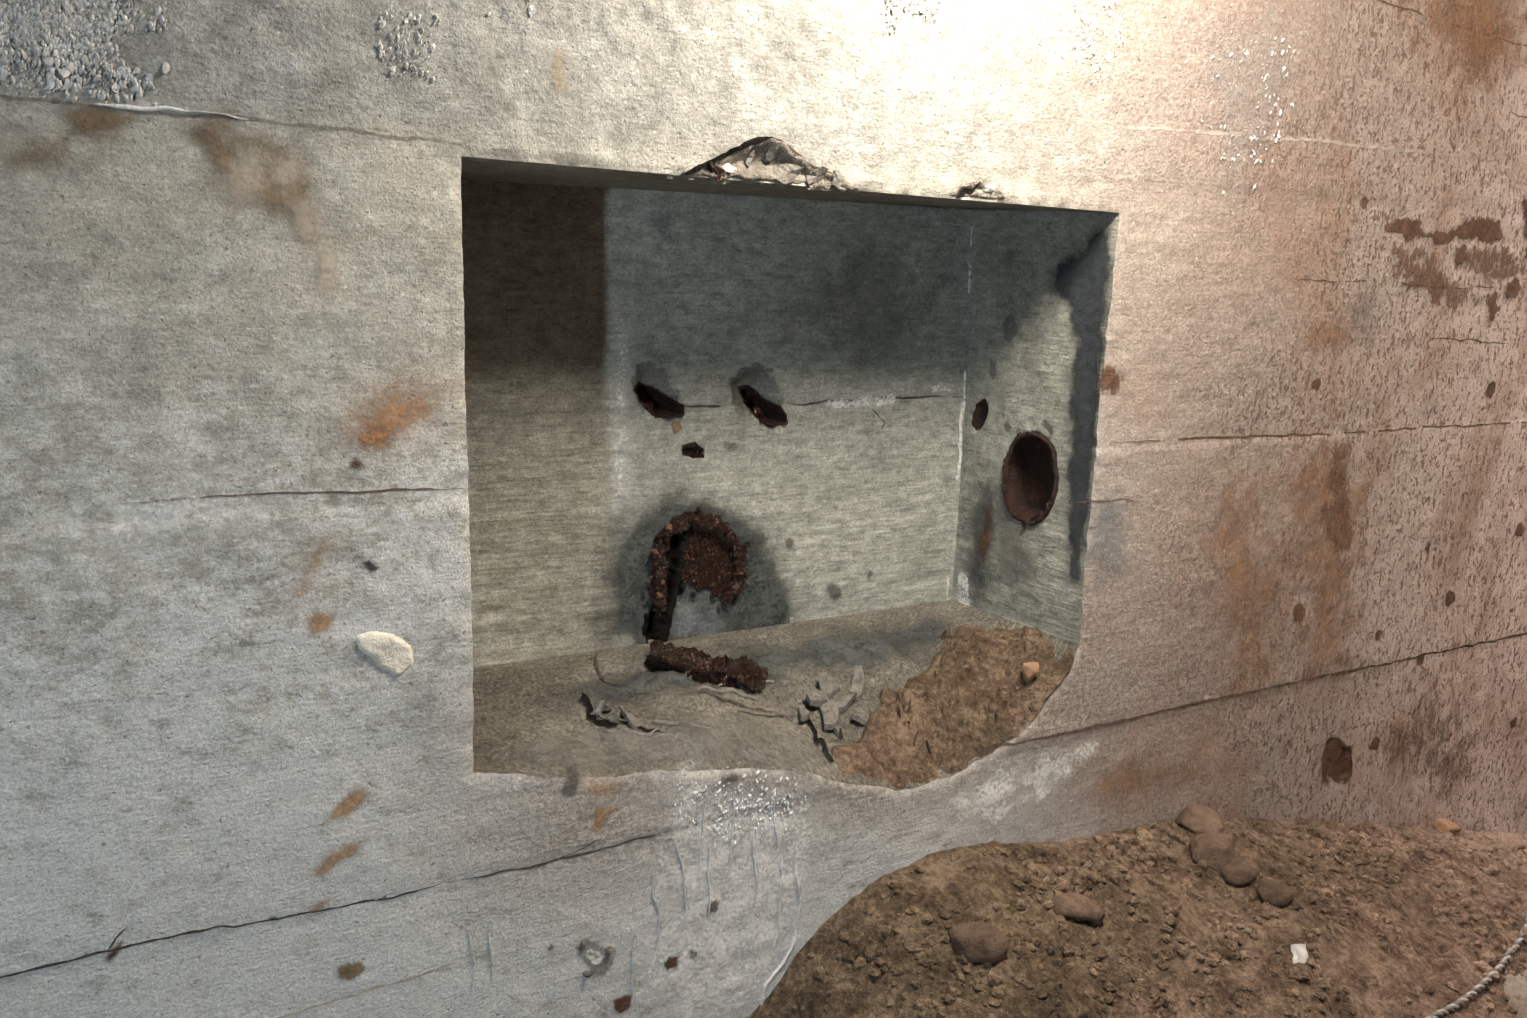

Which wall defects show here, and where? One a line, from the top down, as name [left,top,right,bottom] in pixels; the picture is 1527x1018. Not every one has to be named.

spalling [667,136,859,193]
leakage [1455,244,1467,265]
leakage [1515,199,1527,259]
leakage [1484,279,1521,321]
leakage [1052,232,1111,581]
crack [1129,422,1527,442]
crack [112,488,465,505]
crack [1080,497,1135,505]
crack [984,632,1527,750]
crack [0,821,707,978]